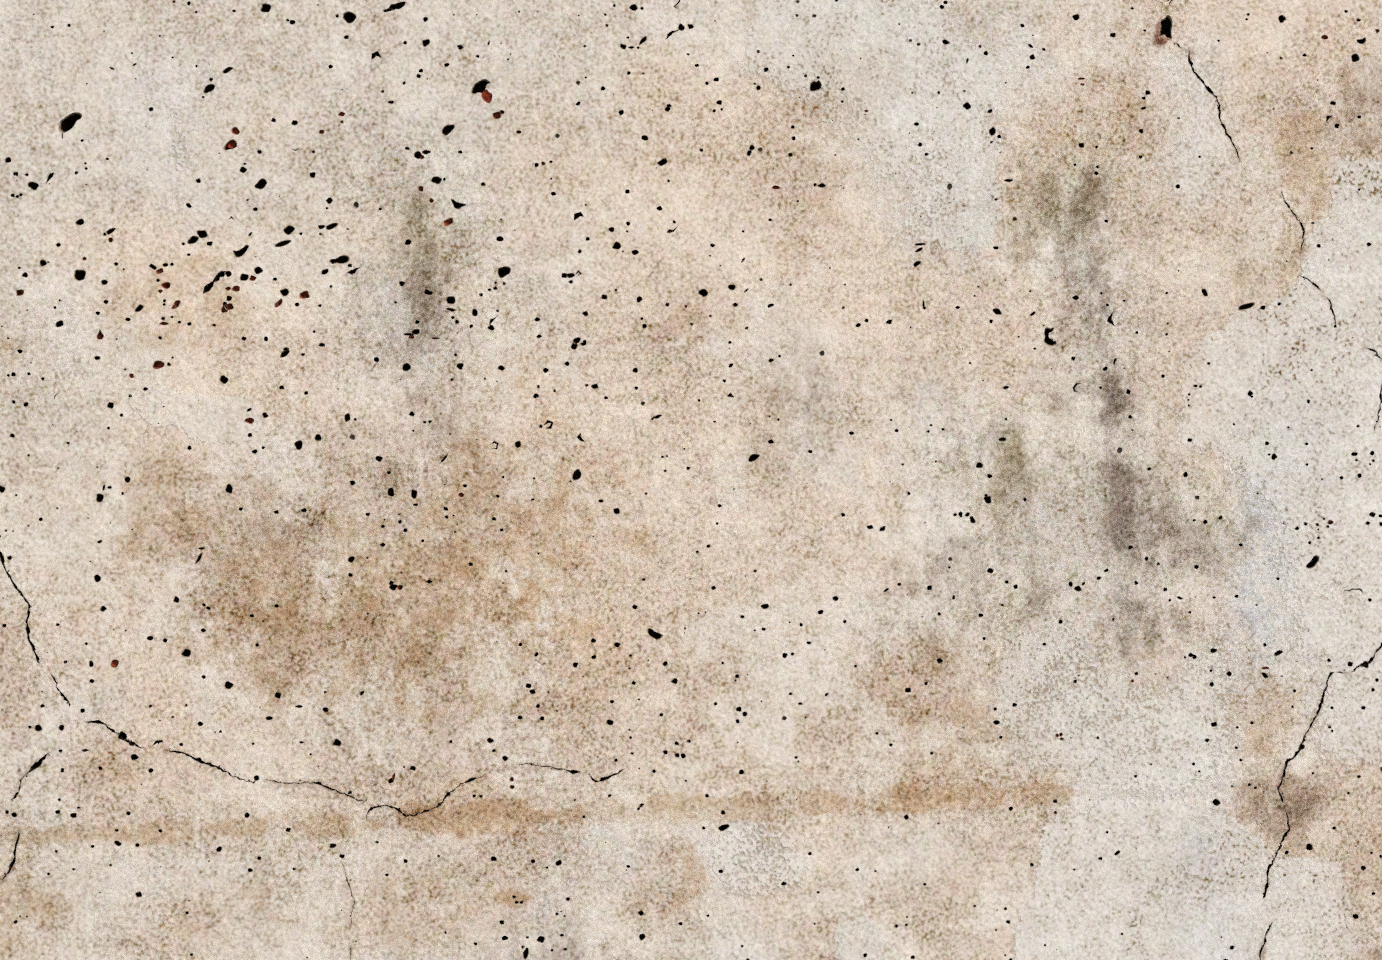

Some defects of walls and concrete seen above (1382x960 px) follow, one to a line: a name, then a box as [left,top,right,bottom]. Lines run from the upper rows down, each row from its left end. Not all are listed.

crack [1176,43,1240,159]
crack [1281,192,1336,327]
crack [1367,348,1382,430]
crack [0,551,484,820]
crack [2,832,20,880]
crack [341,862,355,960]
crack [516,763,624,783]
crack [1259,642,1382,960]